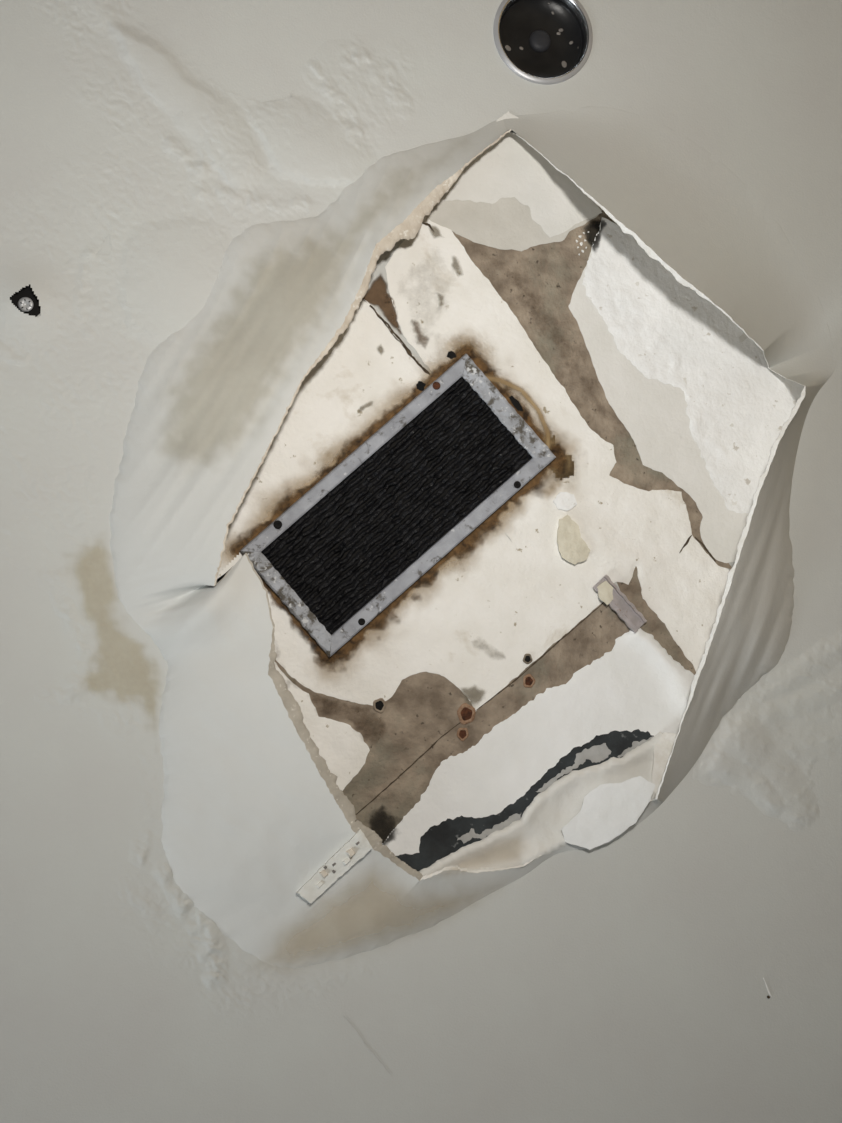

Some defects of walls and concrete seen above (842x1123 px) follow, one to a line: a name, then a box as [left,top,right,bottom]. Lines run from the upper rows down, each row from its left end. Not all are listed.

leakage [585,220,606,251]
leakage [227,392,413,558]
peeling [109,106,837,969]
leakage [463,687,483,704]
leakage [370,807,395,845]